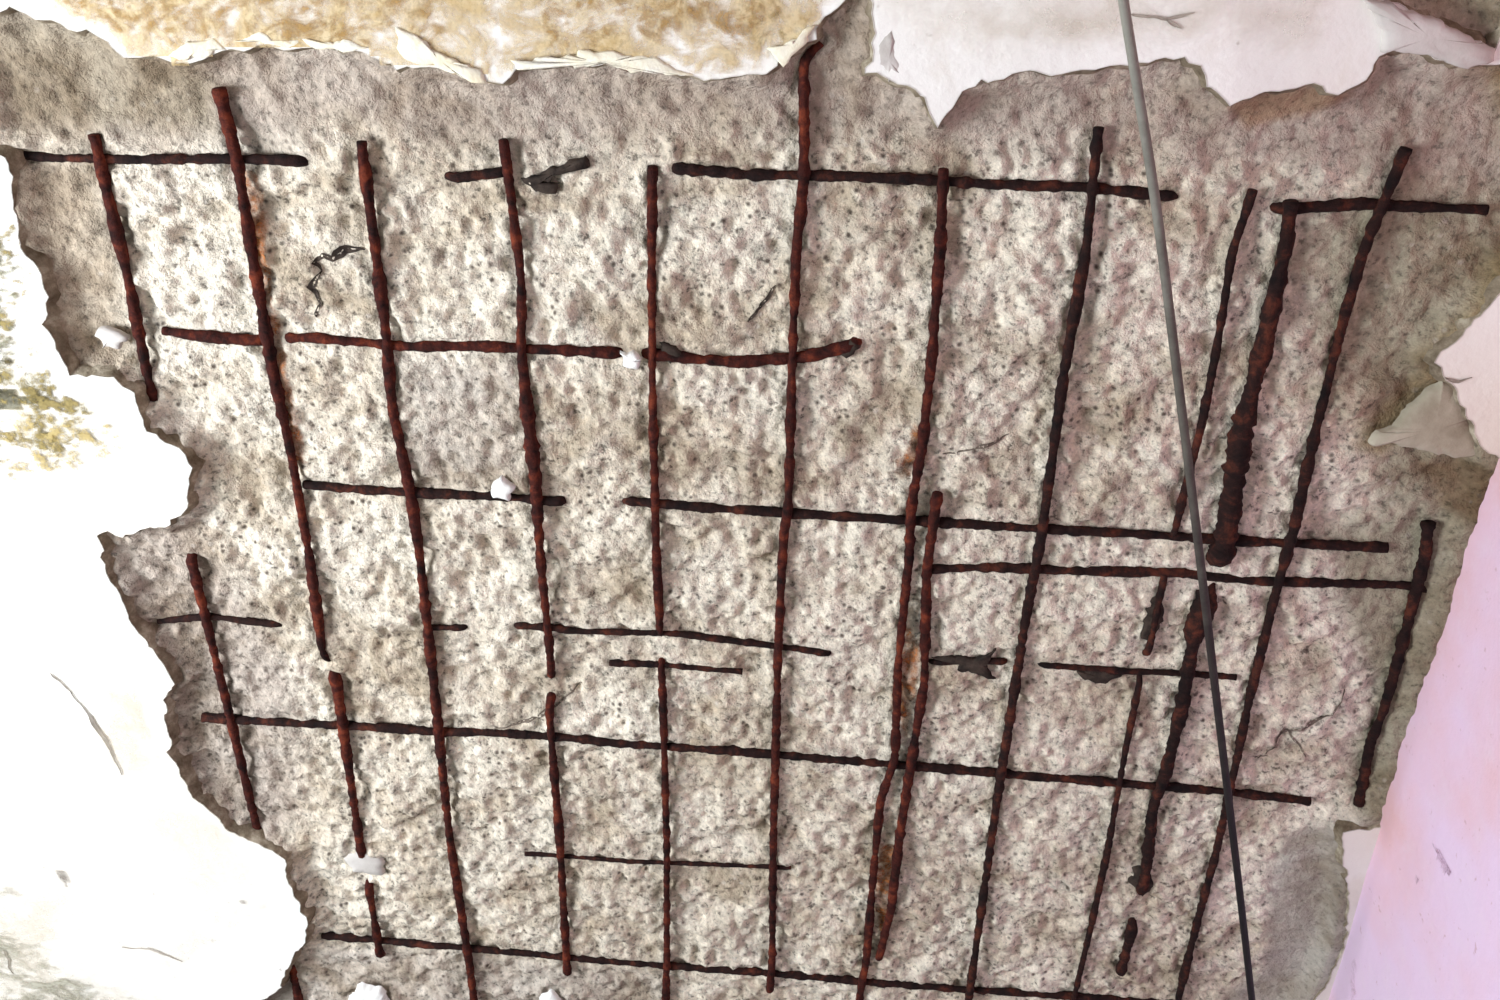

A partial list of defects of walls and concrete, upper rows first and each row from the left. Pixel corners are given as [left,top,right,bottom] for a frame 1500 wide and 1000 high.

rust [521,155,590,194]
rust [245,173,279,334]
water stain [0,224,118,477]
rust [659,341,681,364]
rust [841,339,861,359]
spalling [0,0,1150,1000]
spalling [1139,0,1500,1000]
spalling [965,126,1248,1000]
rust [1140,596,1164,640]
rust [901,629,997,729]
rust [1077,670,1122,684]
rust [1128,865,1154,896]